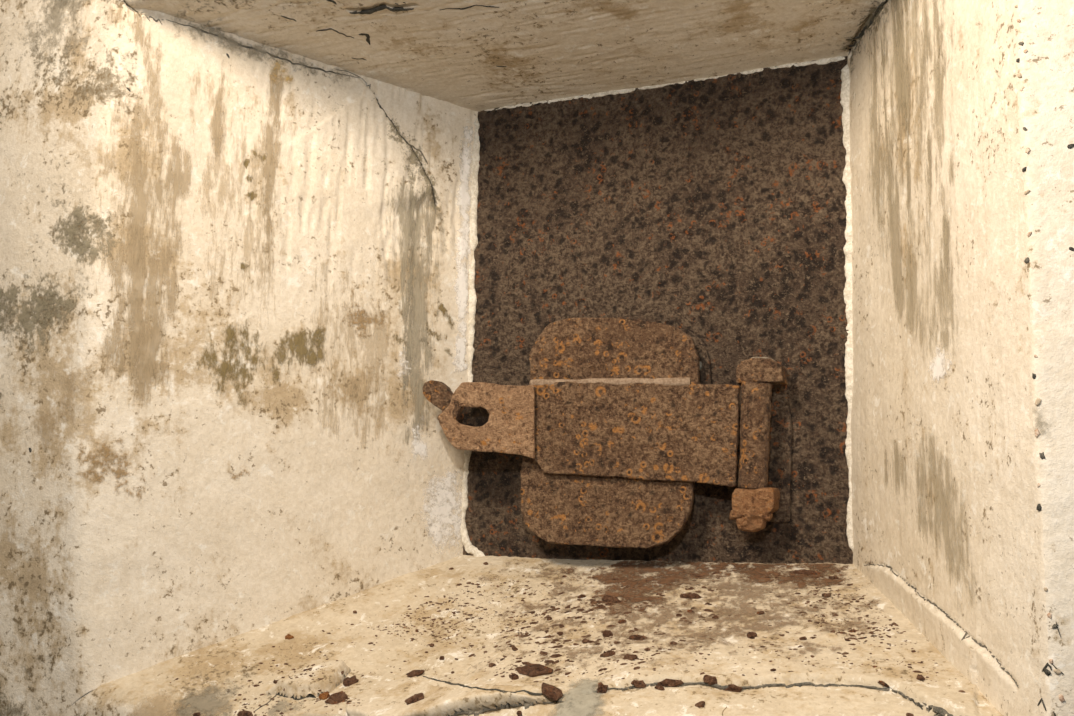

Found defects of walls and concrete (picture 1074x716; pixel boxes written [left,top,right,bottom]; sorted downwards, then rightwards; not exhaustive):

water stain [97,12,191,400]
water stain [177,12,316,264]
crack [124,0,437,206]
water stain [387,119,444,443]
water stain [842,0,953,350]
corrosion [319,675,359,704]
corrosion [405,693,424,705]
crack [417,676,565,716]
corrosion [509,663,563,701]
corrosion [558,560,851,637]
crack [595,682,953,716]
crack [865,564,1056,716]